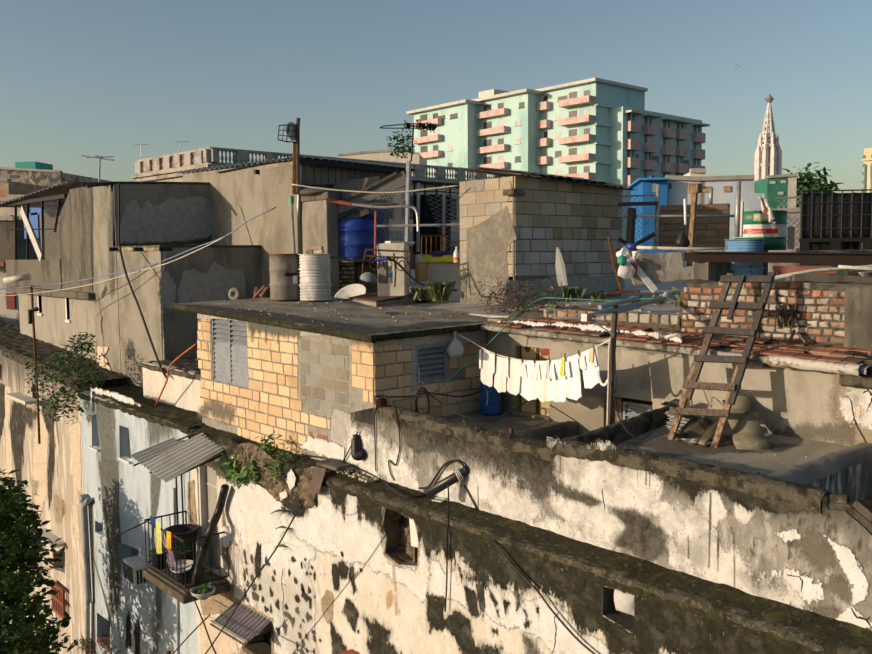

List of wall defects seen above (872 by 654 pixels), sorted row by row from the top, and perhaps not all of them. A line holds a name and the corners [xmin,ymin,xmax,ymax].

leakage [0,384,56,510]
peeling [838,387,872,430]
crack [847,389,872,442]
spalling [187,481,198,535]
mould [243,542,347,654]
leakage [328,479,392,534]
mould [331,552,396,654]
peeling [200,424,612,654]
leakage [401,506,806,654]
leakage [588,434,829,563]
leakage [789,525,852,618]
peeling [823,534,872,629]